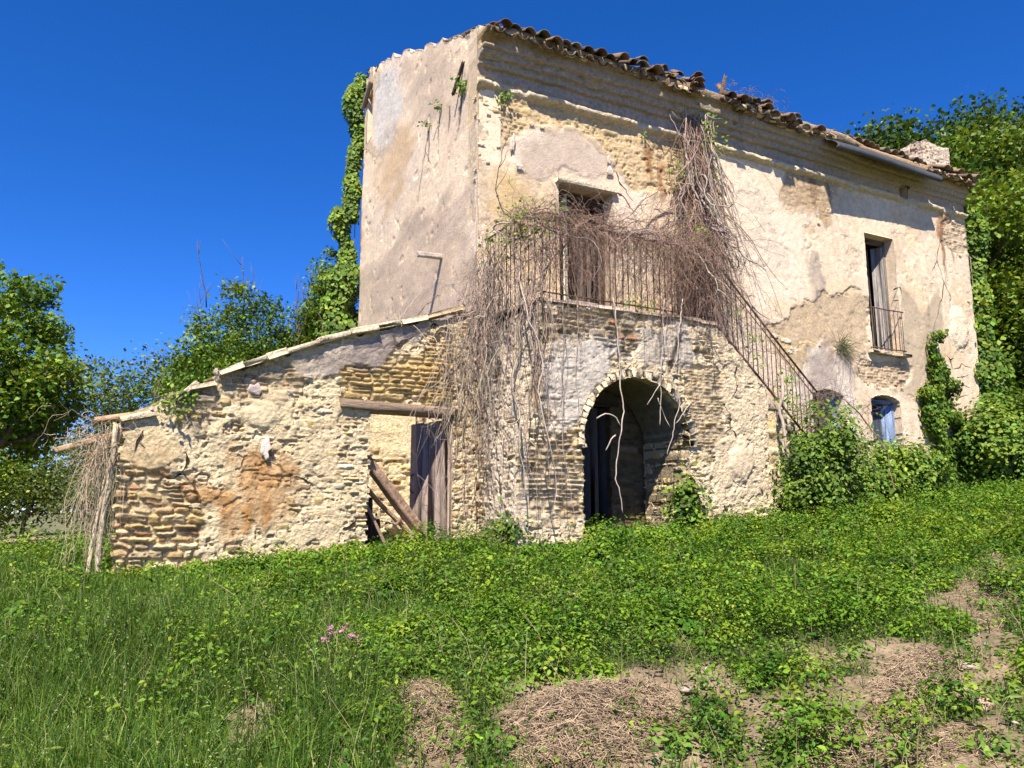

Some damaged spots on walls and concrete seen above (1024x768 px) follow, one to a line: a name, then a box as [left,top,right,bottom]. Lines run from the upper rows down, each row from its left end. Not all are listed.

spalling [469,79,692,220]
spalling [340,340,457,406]
flaking render [764,291,910,389]
spalling [110,448,203,575]